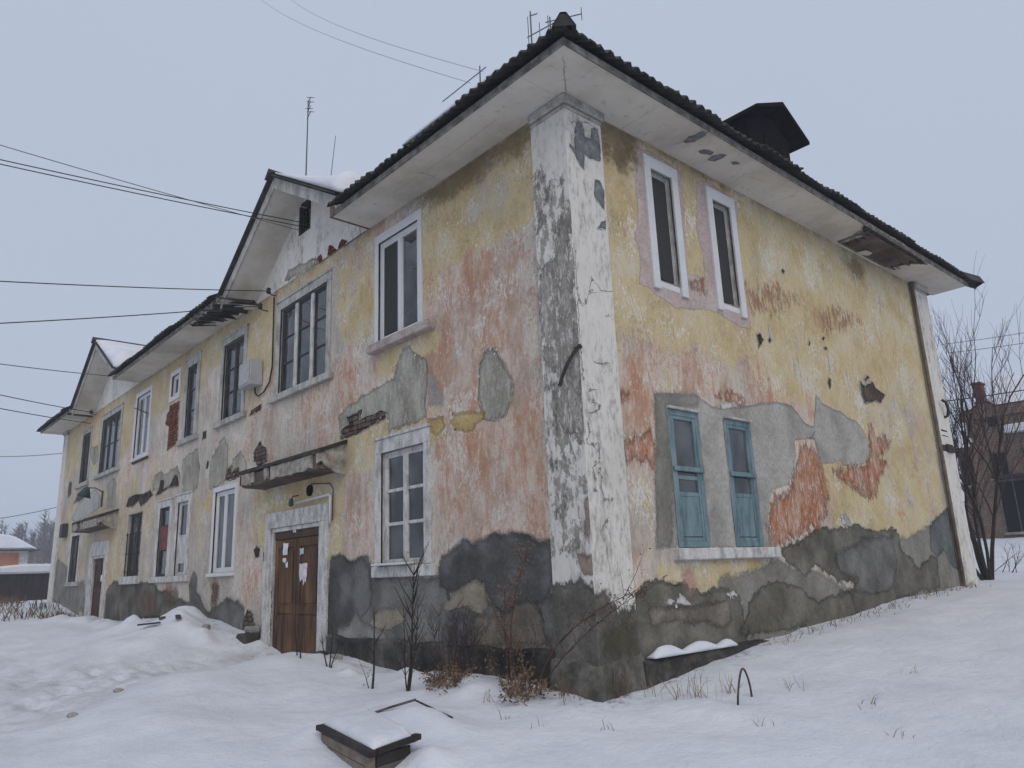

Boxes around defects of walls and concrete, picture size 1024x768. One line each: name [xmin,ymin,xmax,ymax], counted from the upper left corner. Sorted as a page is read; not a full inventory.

peeling [568,120,607,231]
peeling [683,131,740,165]
spalling [836,222,928,270]
peeling [338,345,515,439]
spalling [846,370,885,405]
spalling [165,400,180,451]
peeling [72,430,268,521]
peeling [624,388,892,548]
damp [52,560,85,615]
damp [104,572,244,630]
damp [327,508,961,666]